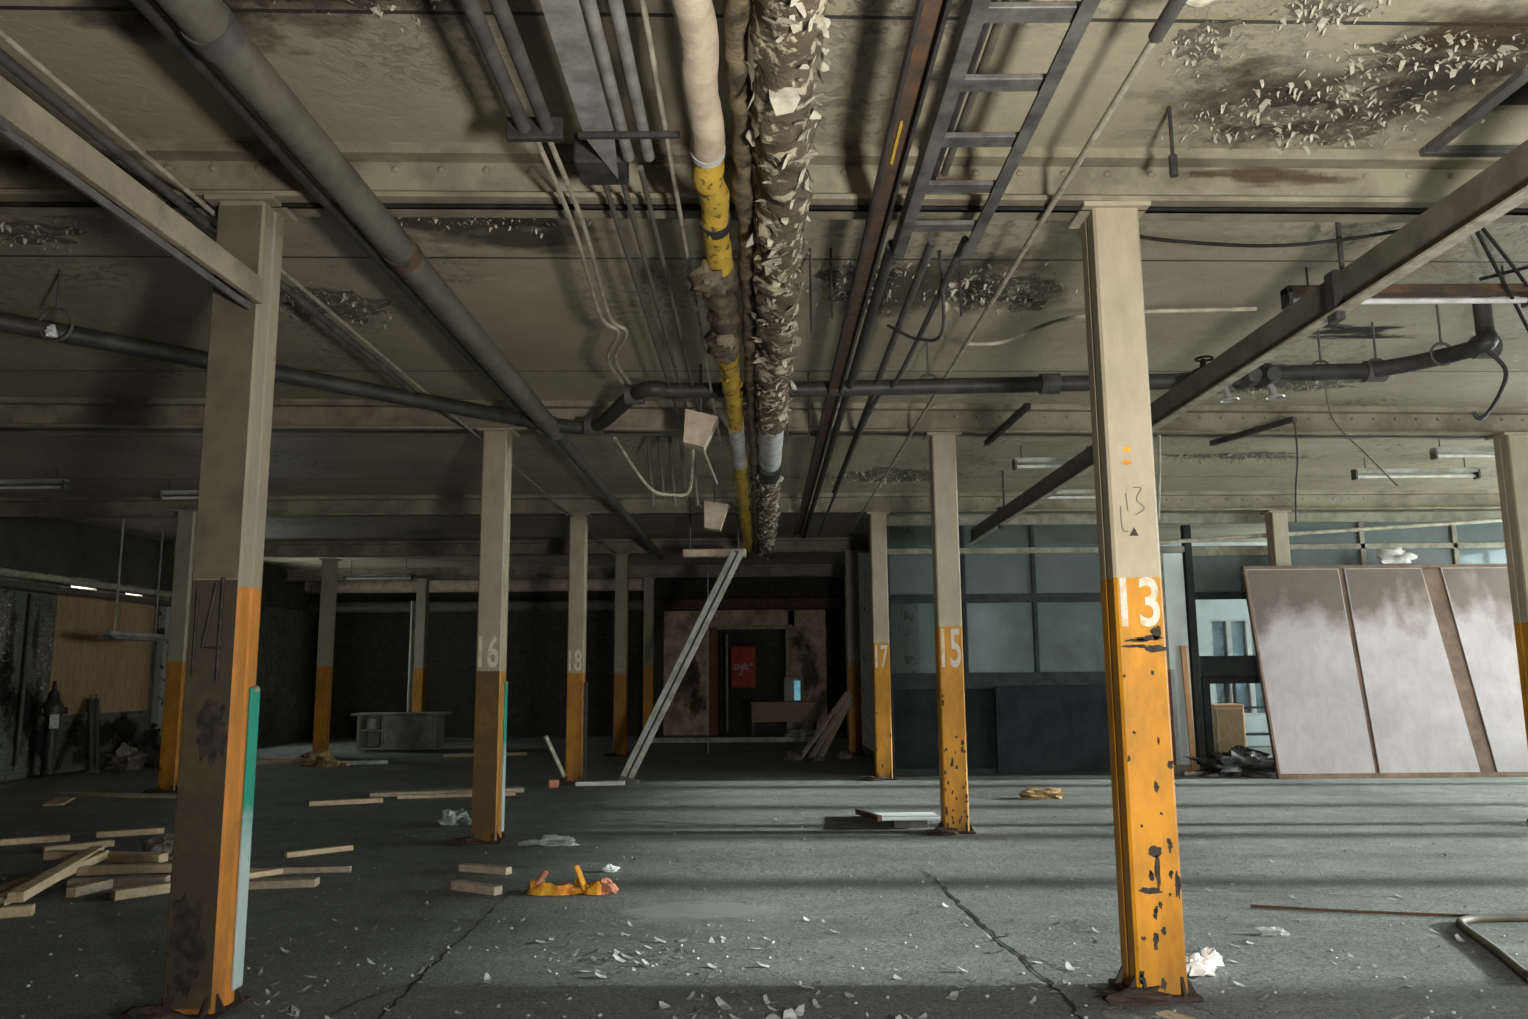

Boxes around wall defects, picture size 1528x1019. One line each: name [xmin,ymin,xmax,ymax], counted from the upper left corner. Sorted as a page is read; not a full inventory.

peeling [345,0,396,16]
peeling [1147,0,1528,155]
peeling [720,0,858,561]
peeling [865,253,1079,322]
peeling [816,467,930,487]
peeling [1121,625,1167,675]
crack [919,868,1083,1019]
peeling [1138,838,1181,950]